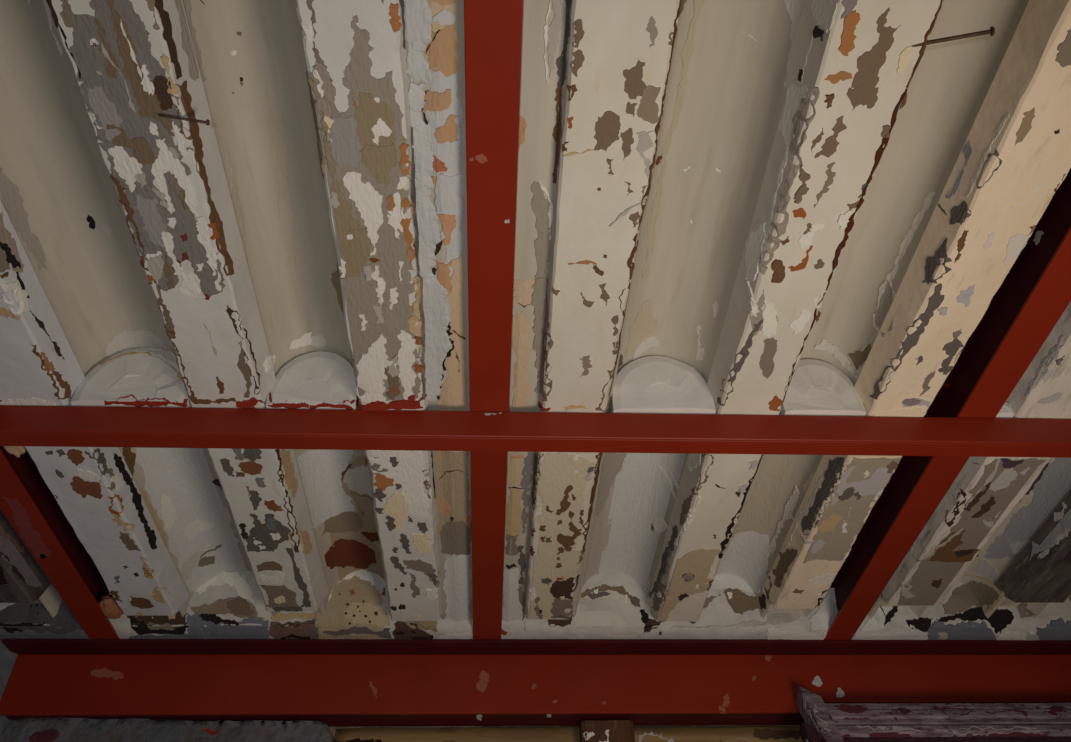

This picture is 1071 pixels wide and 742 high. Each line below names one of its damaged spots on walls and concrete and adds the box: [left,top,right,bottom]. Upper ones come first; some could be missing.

peeling [60,0,234,397]
peeling [226,305,261,398]
peeling [295,0,422,404]
flaking render [422,0,461,186]
peeling [594,60,661,200]
spalling [870,201,975,408]
peeling [1002,225,1044,273]
spalling [45,447,472,640]
peeling [505,452,603,630]
spalling [625,454,798,633]
spalling [878,578,1071,640]
spalling [929,458,1050,563]